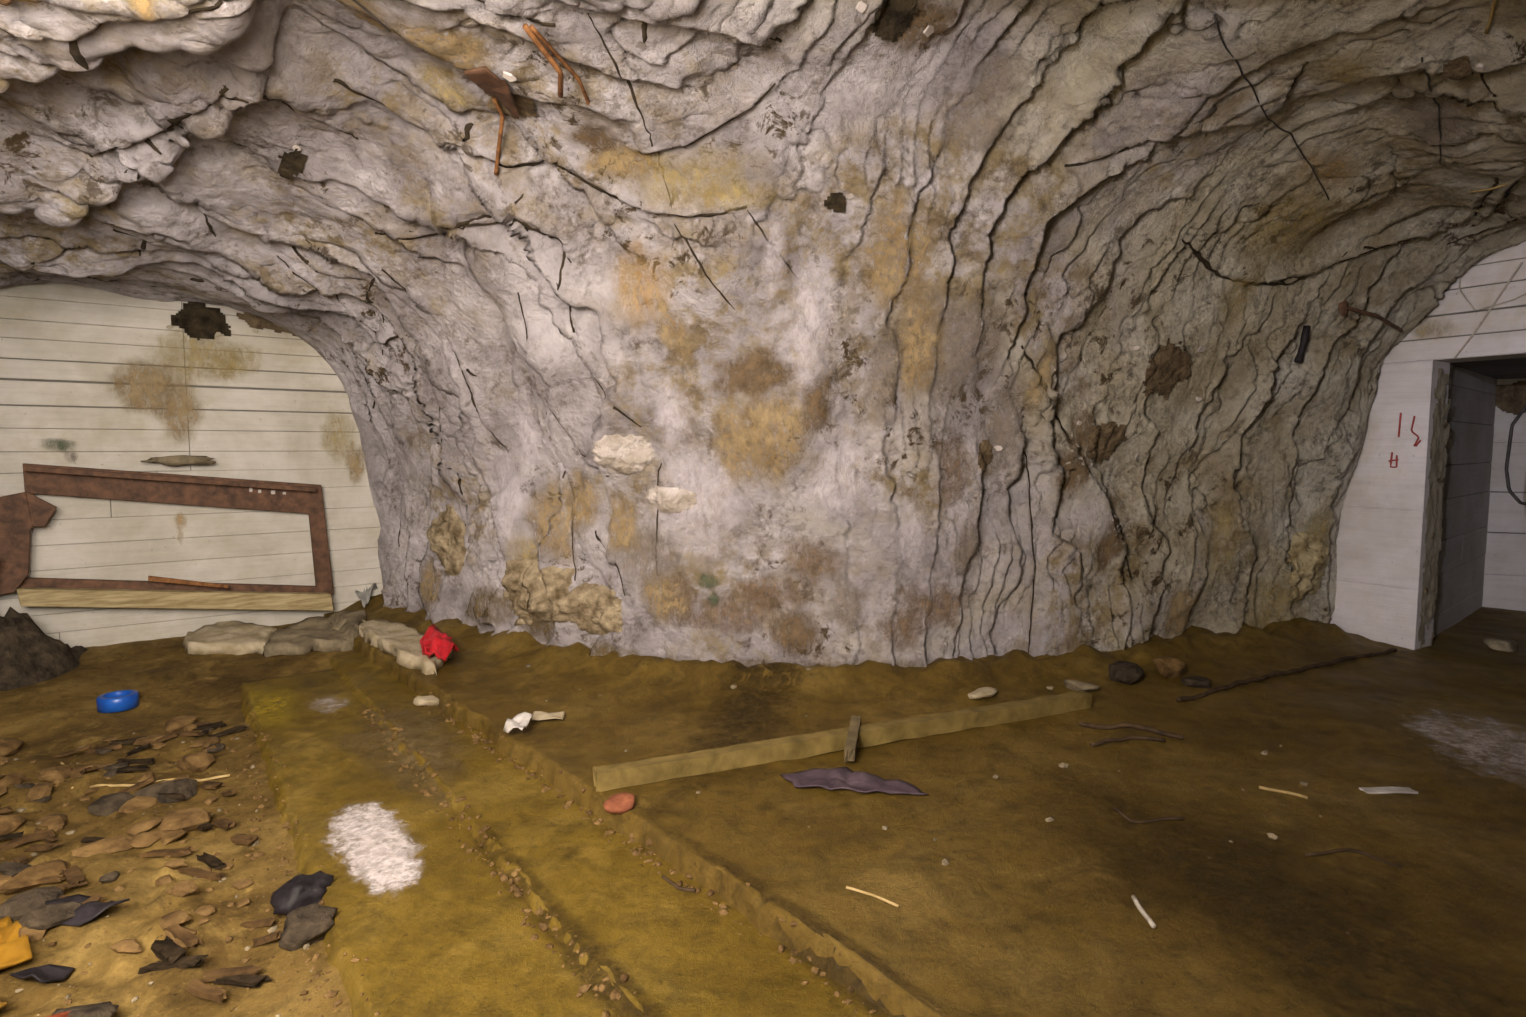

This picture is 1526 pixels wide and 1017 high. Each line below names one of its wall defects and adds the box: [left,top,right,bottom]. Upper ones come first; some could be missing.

crack [69,23,103,70]
crack [188,0,222,14]
crack [89,85,359,185]
crack [253,0,795,356]
crack [1064,140,1150,167]
crack [12,228,205,287]
crack [1182,179,1519,286]
spalling [166,301,296,343]
damp [114,338,249,437]
crack [439,350,509,526]
crack [546,401,662,596]
crack [1017,345,1133,653]